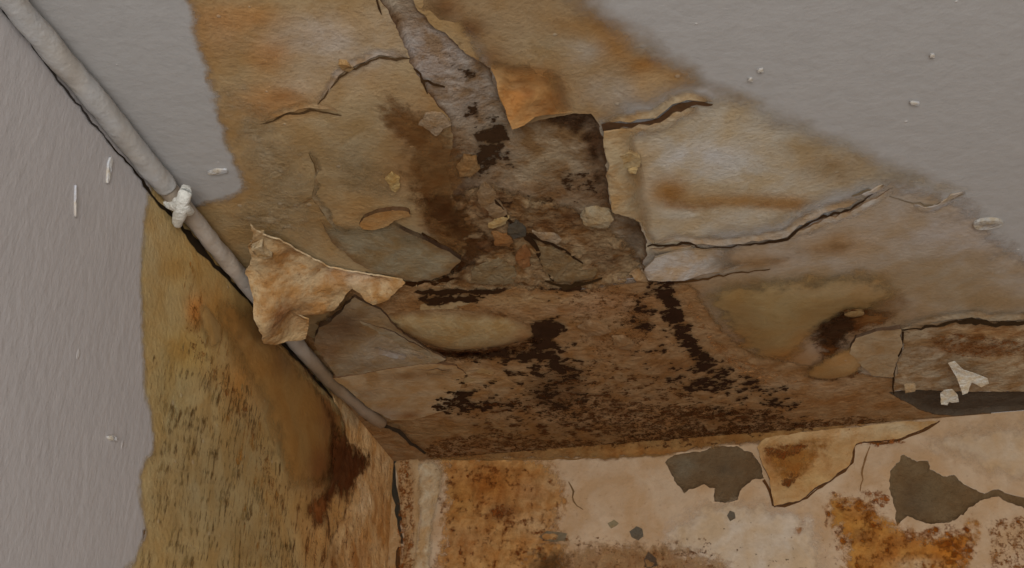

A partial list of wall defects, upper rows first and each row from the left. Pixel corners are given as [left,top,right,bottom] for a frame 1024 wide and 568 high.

leakage [188,0,512,310]
crack [260,50,445,125]
leakage [413,0,700,125]
crack [602,92,713,135]
peeling [245,0,1024,526]
leakage [431,99,1024,453]
crack [647,184,963,284]
leakage [132,186,356,568]
corrosion [434,457,726,568]
corrosion [825,491,1024,568]